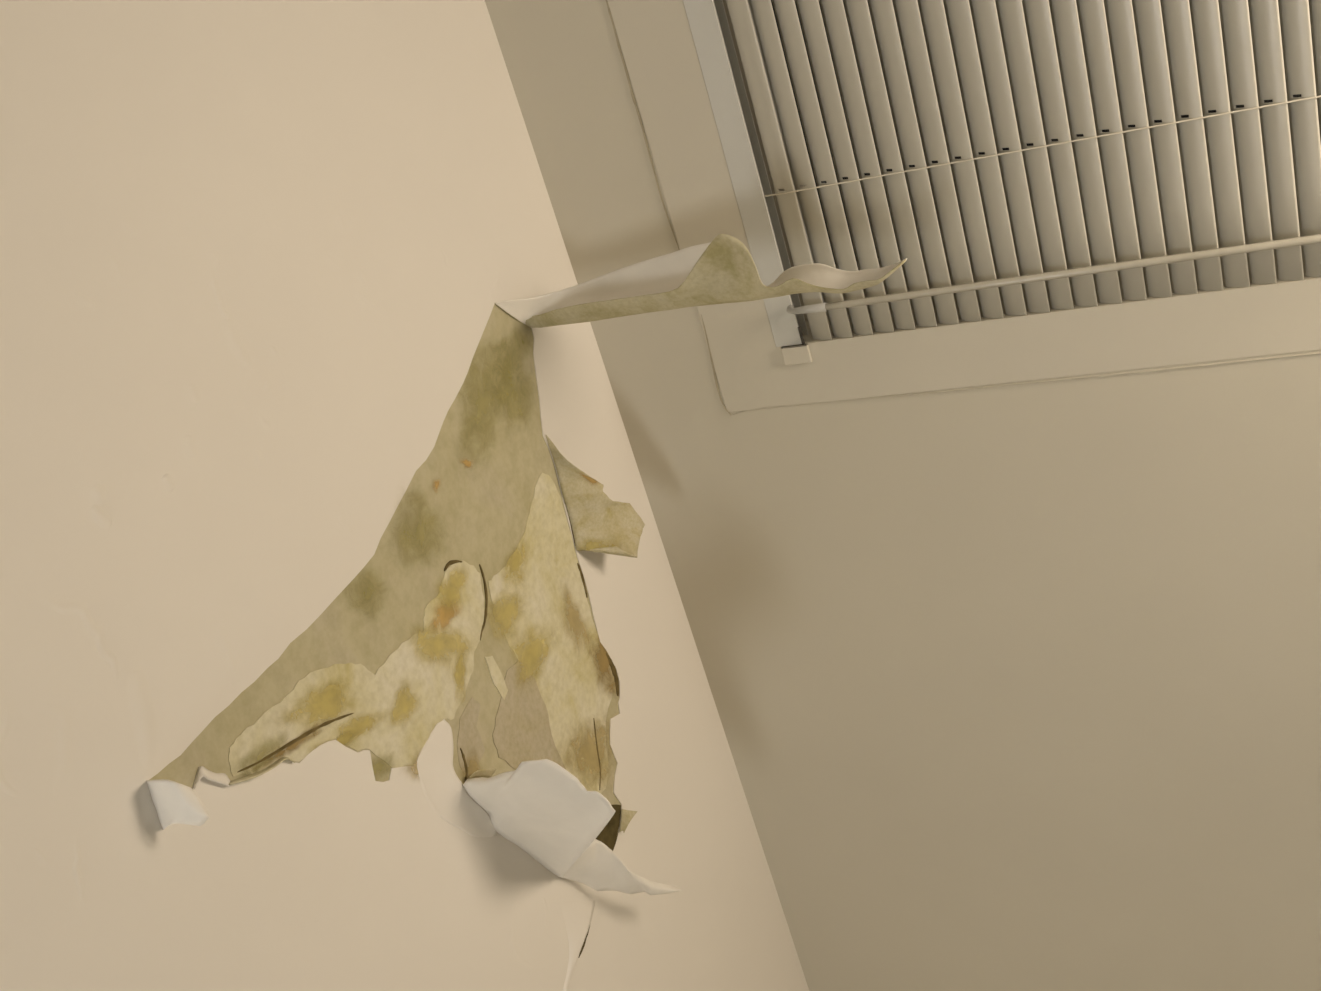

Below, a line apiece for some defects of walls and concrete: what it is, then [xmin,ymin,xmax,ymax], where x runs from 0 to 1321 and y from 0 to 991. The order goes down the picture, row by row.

peeling [150,304,637,851]